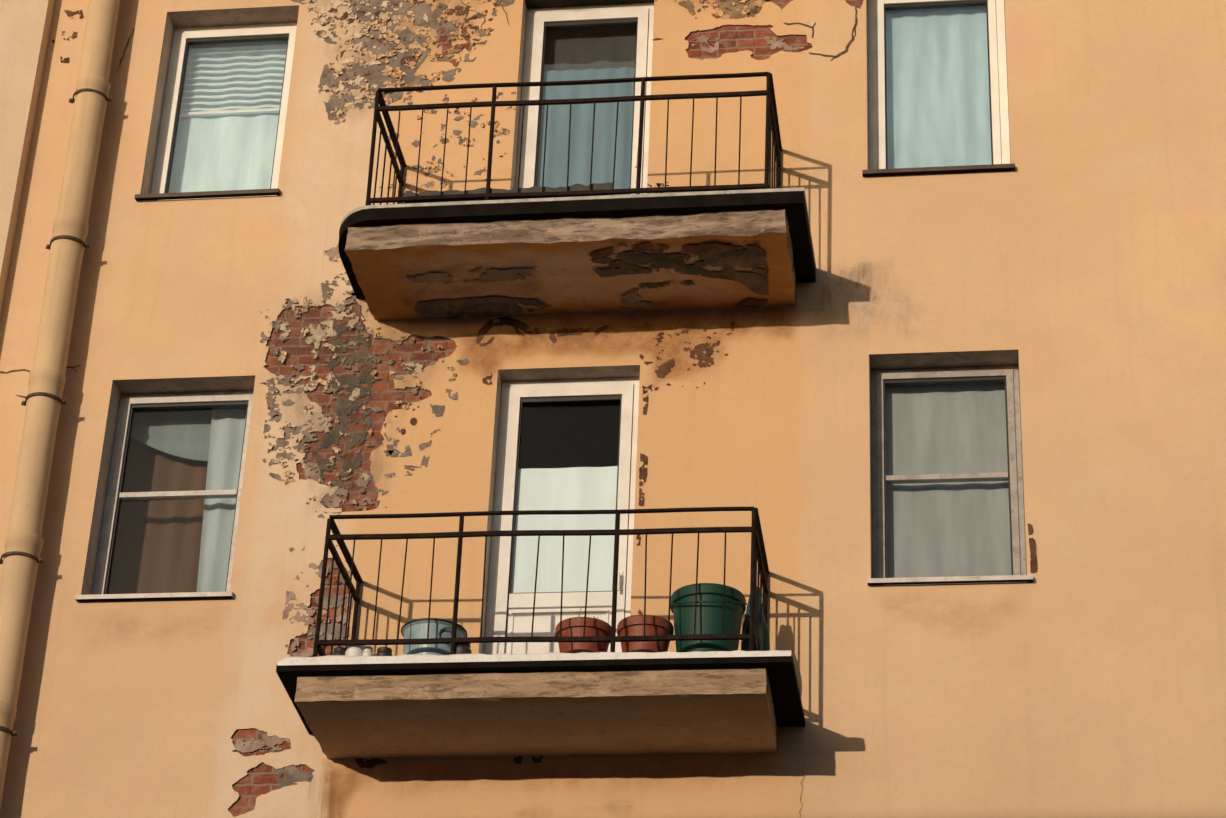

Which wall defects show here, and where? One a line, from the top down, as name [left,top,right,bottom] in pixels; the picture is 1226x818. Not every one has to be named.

peeling [675,0,813,51]
peeling [291,0,514,188]
peeling [406,268,608,346]
peeling [260,245,469,518]
peeling [282,545,354,657]